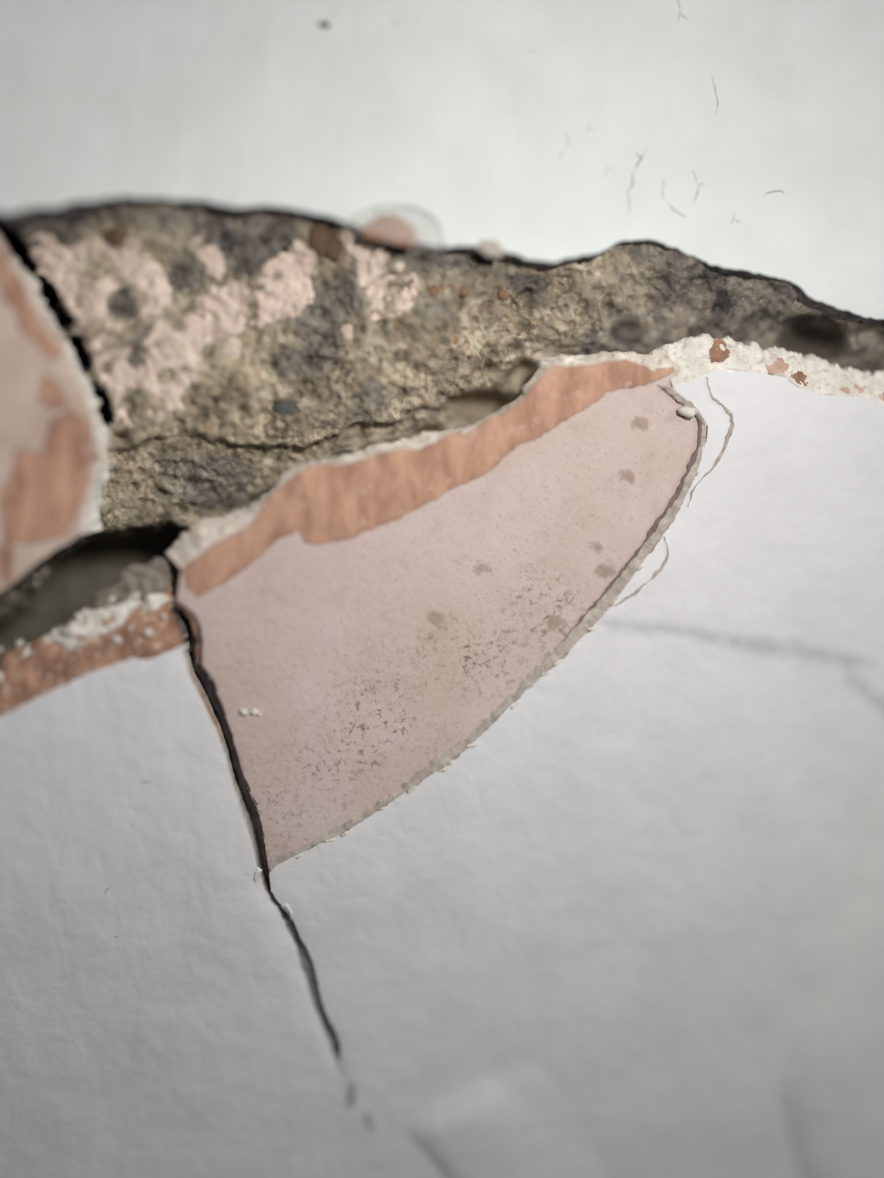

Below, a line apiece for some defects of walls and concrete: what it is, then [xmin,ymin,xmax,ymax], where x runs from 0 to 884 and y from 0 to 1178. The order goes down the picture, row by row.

crack [0,520,341,1061]
peeling [0,204,884,873]